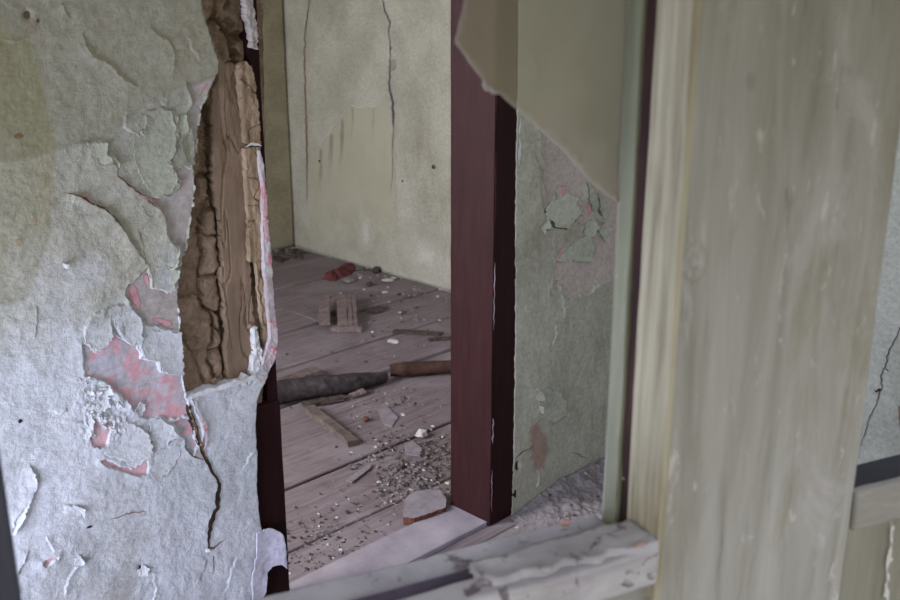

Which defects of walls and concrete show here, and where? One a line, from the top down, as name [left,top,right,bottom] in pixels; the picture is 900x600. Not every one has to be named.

crack [302,4,310,200]
crack [382,0,394,192]
spalling [75,0,278,480]
peeling [540,130,618,312]
crack [860,328,900,447]
crack [186,404,225,572]